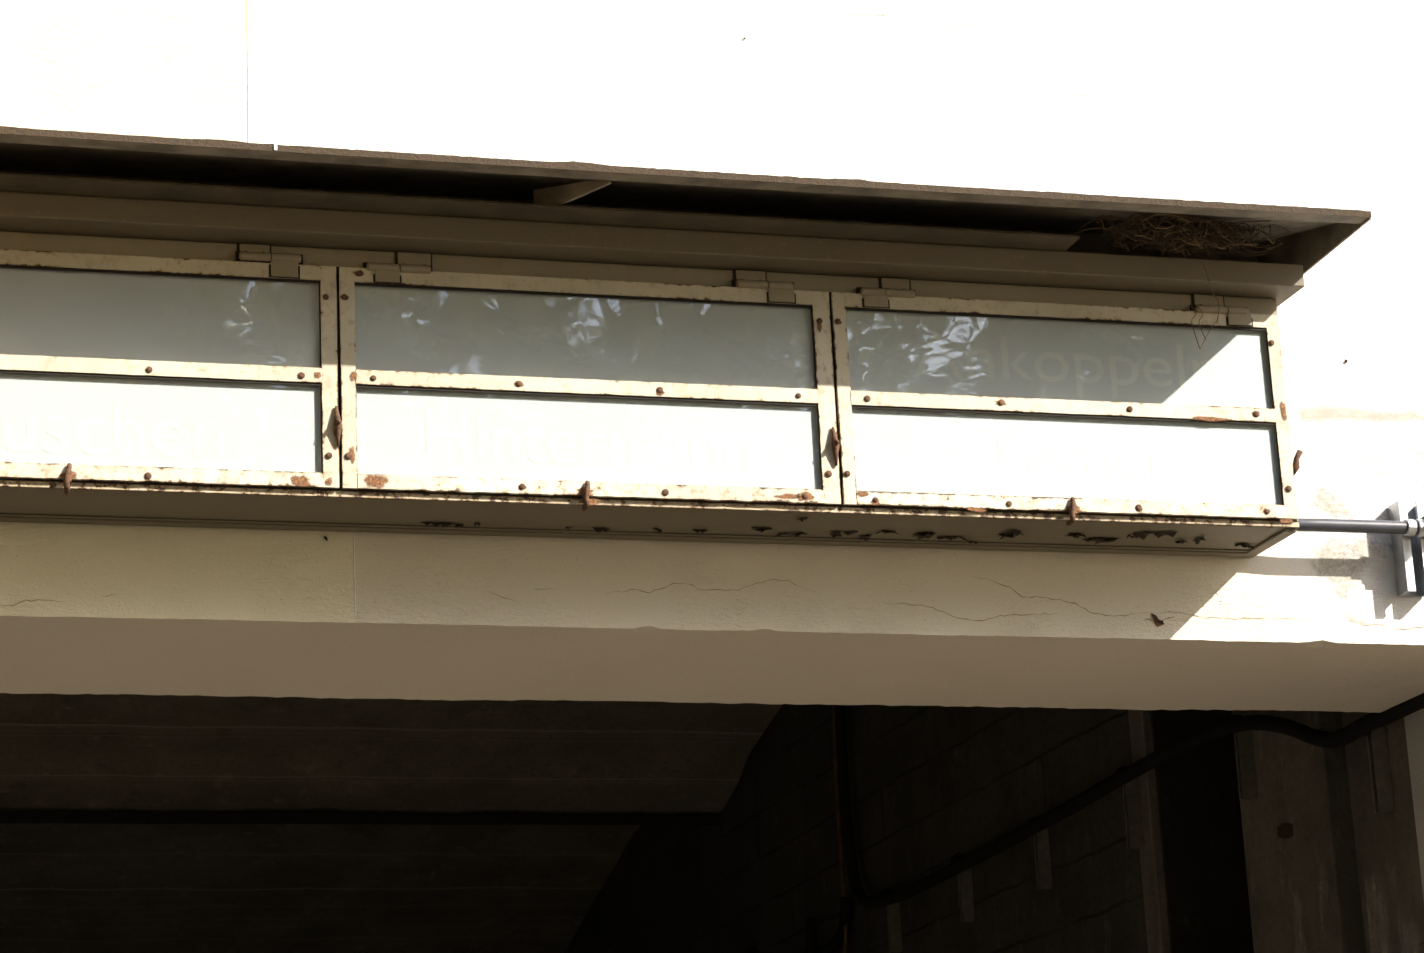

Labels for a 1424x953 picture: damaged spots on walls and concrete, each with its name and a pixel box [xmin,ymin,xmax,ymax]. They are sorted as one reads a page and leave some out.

crack [888,577,1318,621]